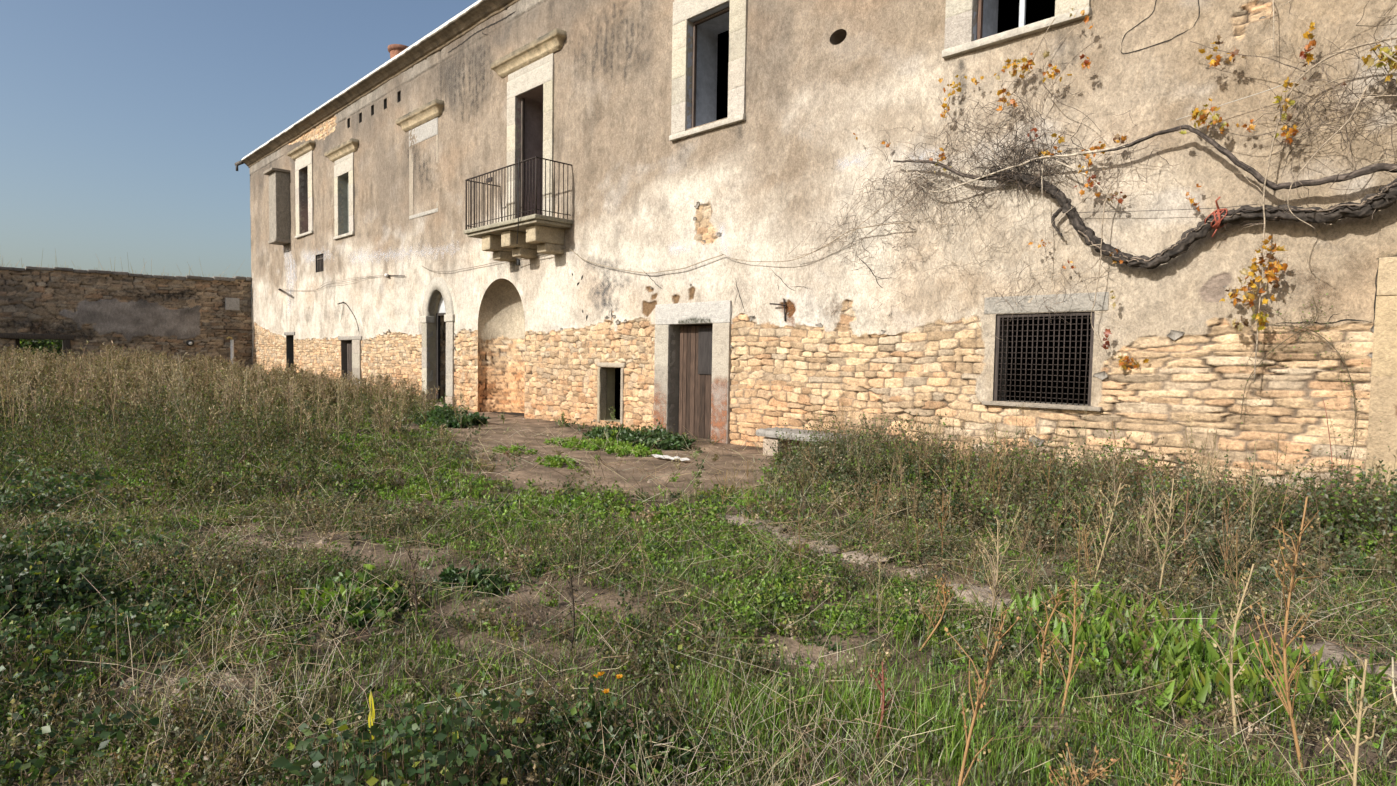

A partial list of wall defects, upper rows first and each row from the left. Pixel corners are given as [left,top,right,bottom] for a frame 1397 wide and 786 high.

flaking render [693,201,722,245]
flaking render [453,284,696,431]
flaking render [729,273,1374,507]